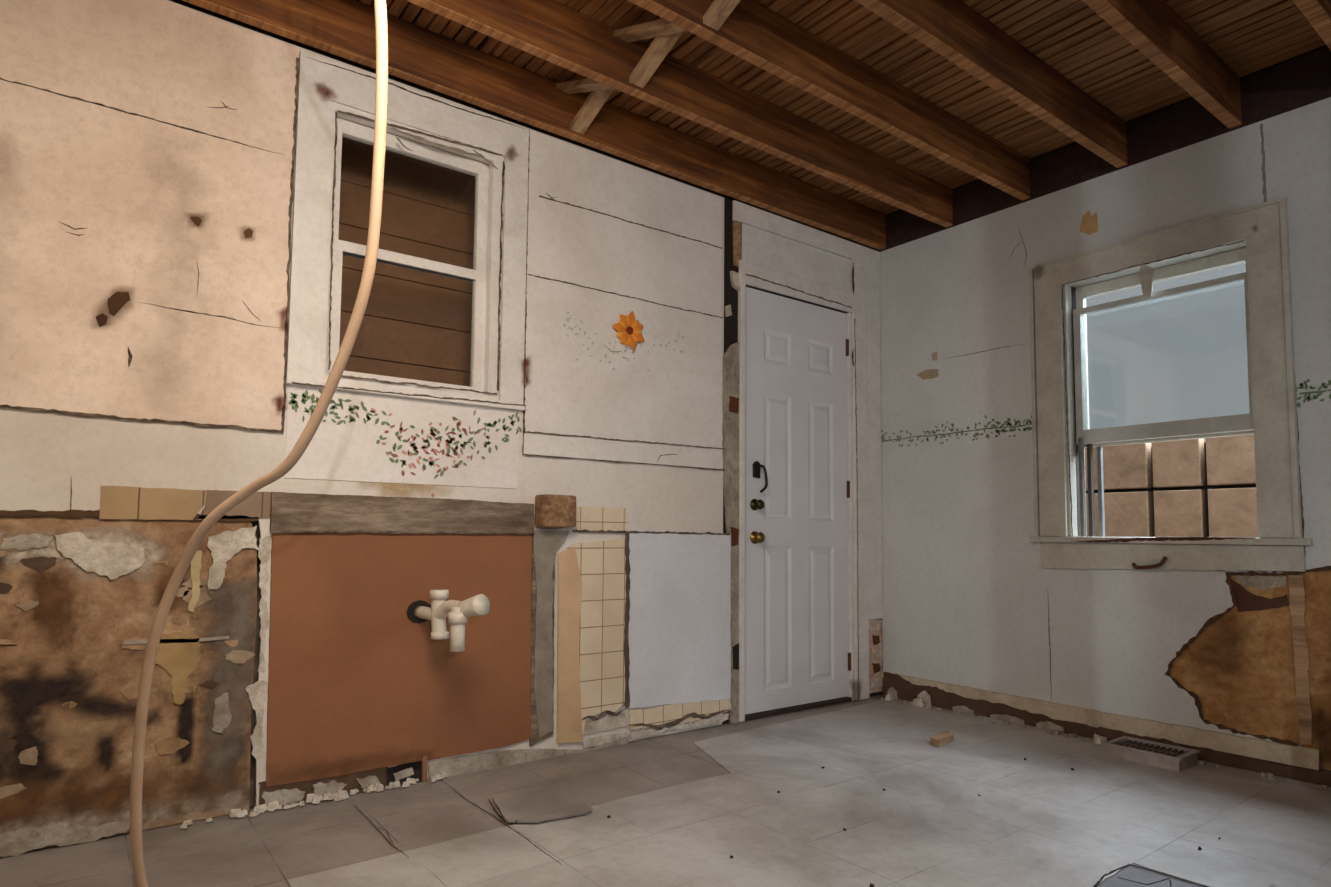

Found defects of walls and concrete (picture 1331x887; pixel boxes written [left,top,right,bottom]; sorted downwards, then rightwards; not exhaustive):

peeling [0,510,146,579]
damp [29,572,74,638]
damp [157,564,191,609]
damp [176,577,258,801]
spalling [869,566,1331,787]
damp [0,671,156,827]
peeling [0,821,130,857]